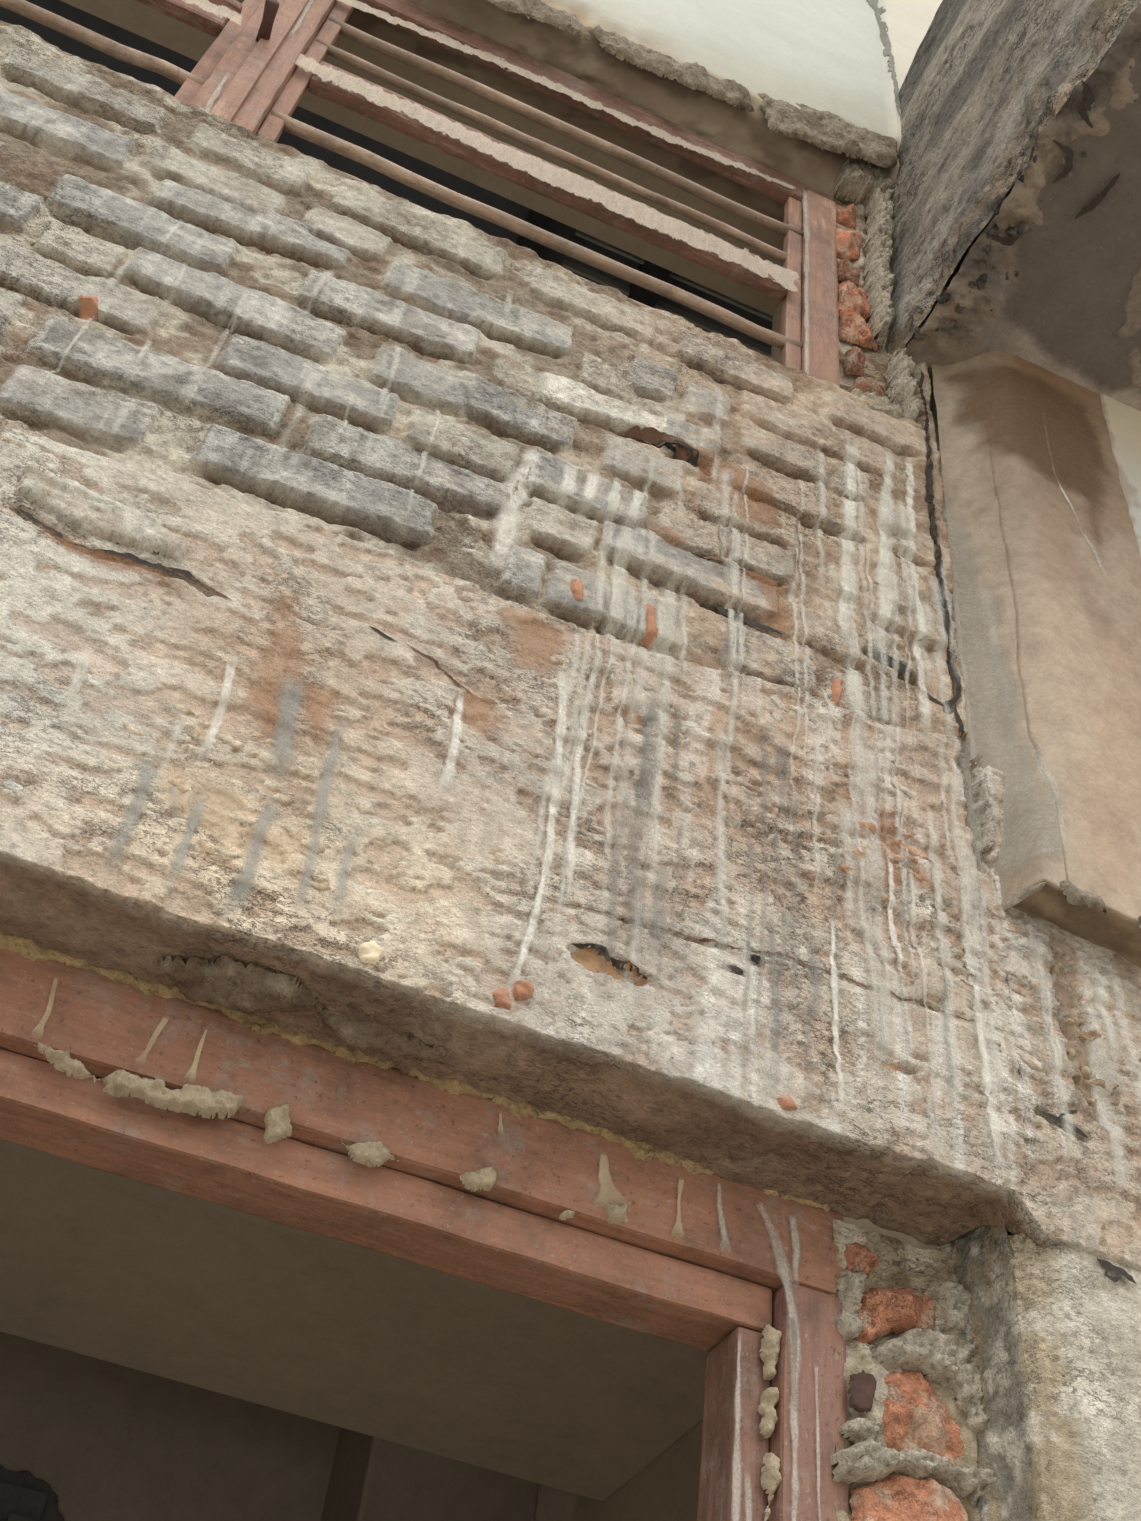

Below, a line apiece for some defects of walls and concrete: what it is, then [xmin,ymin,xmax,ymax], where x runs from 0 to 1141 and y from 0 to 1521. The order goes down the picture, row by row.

spalling [913,192,1029,340]
flaking render [1119,268,1141,388]
crack [17,507,233,601]
water stain [493,455,537,559]
water stain [713,463,748,887]
water stain [789,477,833,727]
crack [871,369,965,762]
water stain [954,367,1102,506]
water stain [834,445,1063,1144]
spalling [571,943,647,985]
water stain [807,924,842,1078]